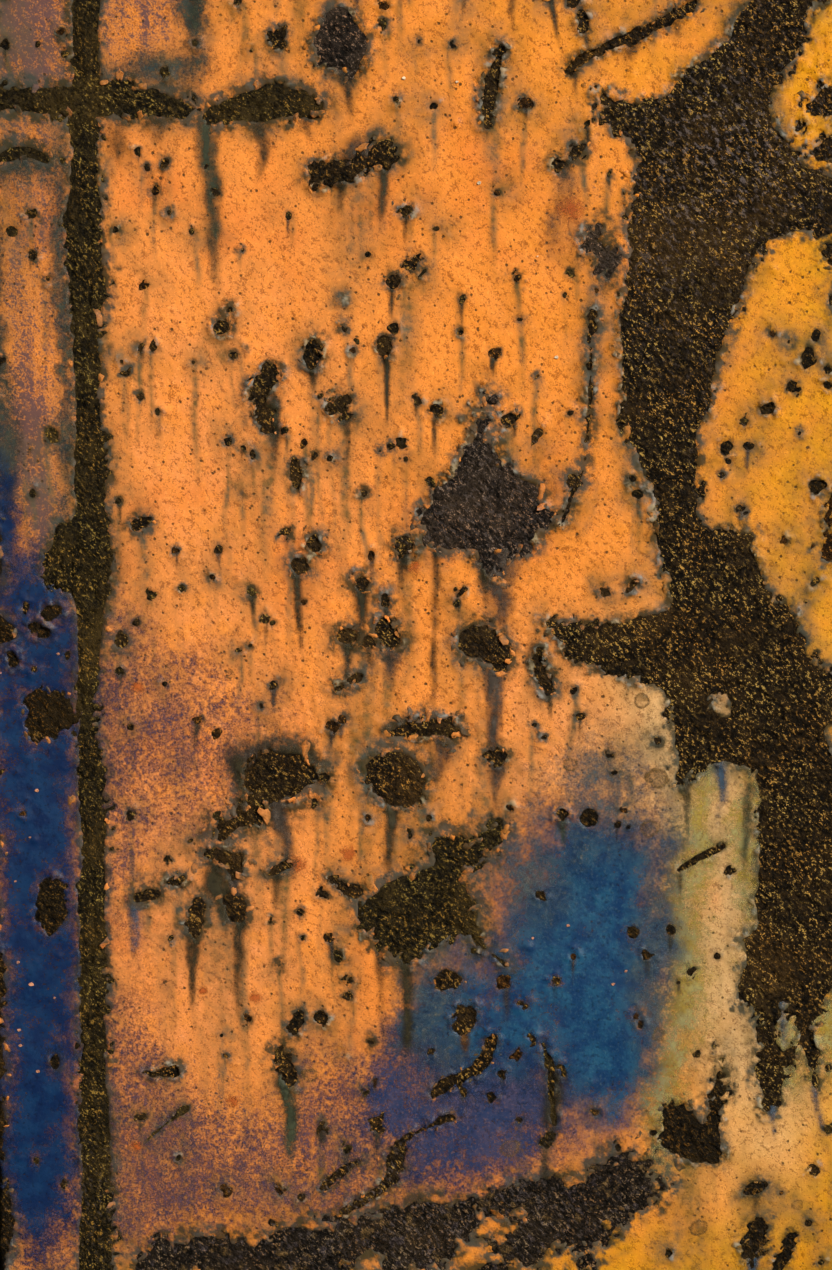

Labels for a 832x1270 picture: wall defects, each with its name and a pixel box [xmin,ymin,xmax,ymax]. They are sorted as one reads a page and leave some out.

rust [267,0,367,105]
rust [378,1,389,31]
rust [308,136,412,225]
rust [297,339,357,437]
rust [342,252,426,419]
rust [379,437,408,462]
rust [0,0,333,1270]
rust [330,550,407,692]
rust [392,0,832,1134]
rust [315,706,528,1047]
rust [135,1041,739,1270]